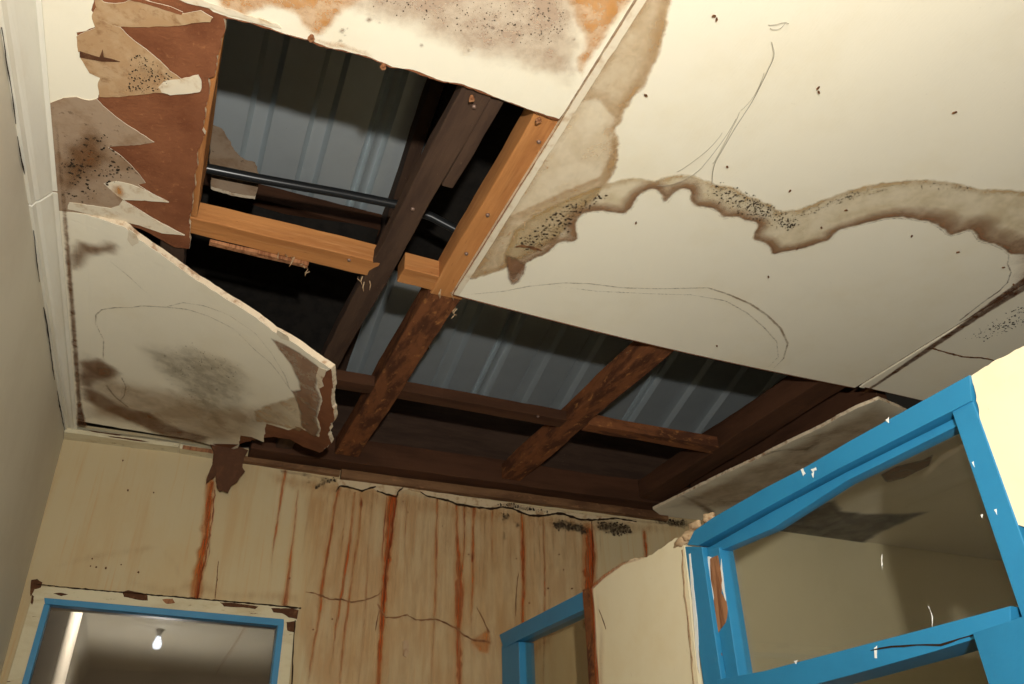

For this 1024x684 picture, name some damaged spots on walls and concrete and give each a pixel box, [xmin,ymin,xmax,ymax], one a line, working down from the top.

peeling [50,0,281,236]
water stain [498,126,1024,283]
water stain [63,211,205,442]
water stain [256,341,320,436]
rust [193,482,215,598]
crack [37,561,490,684]
peeling [271,608,299,632]
rust [377,495,397,683]
rust [455,505,474,684]
crack [335,485,637,522]
peeling [708,556,728,633]
crack [871,634,974,651]